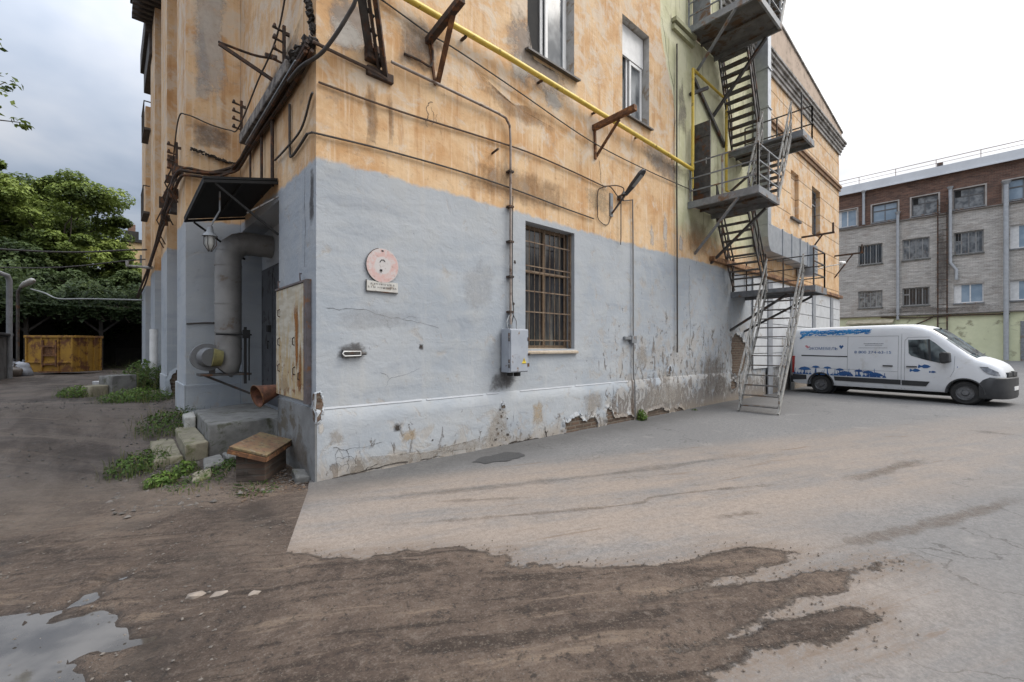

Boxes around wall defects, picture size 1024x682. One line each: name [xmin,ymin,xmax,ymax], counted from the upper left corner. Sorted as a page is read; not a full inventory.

rust [280,310,301,391]
flaking render [728,330,747,394]
spalling [312,390,325,433]
flaking render [560,397,685,434]
crack [332,442,443,479]